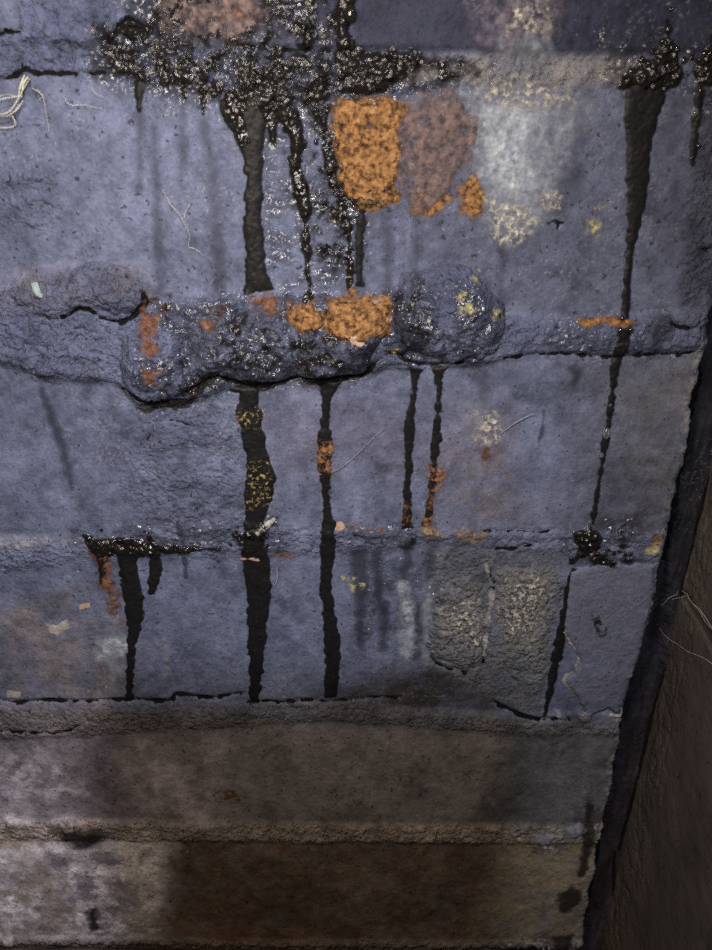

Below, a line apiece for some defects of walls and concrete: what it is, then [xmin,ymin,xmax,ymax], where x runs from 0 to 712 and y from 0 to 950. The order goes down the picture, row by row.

water stain [134,79,146,112]
water stain [219,88,366,303]
rust [330,90,487,218]
water stain [689,88,705,166]
rust [137,300,170,385]
rust [249,286,392,347]
rust [577,316,633,328]
water stain [590,85,666,525]
water stain [401,364,448,549]
water stain [229,381,276,705]
water stain [306,376,365,698]
water stain [543,568,577,716]